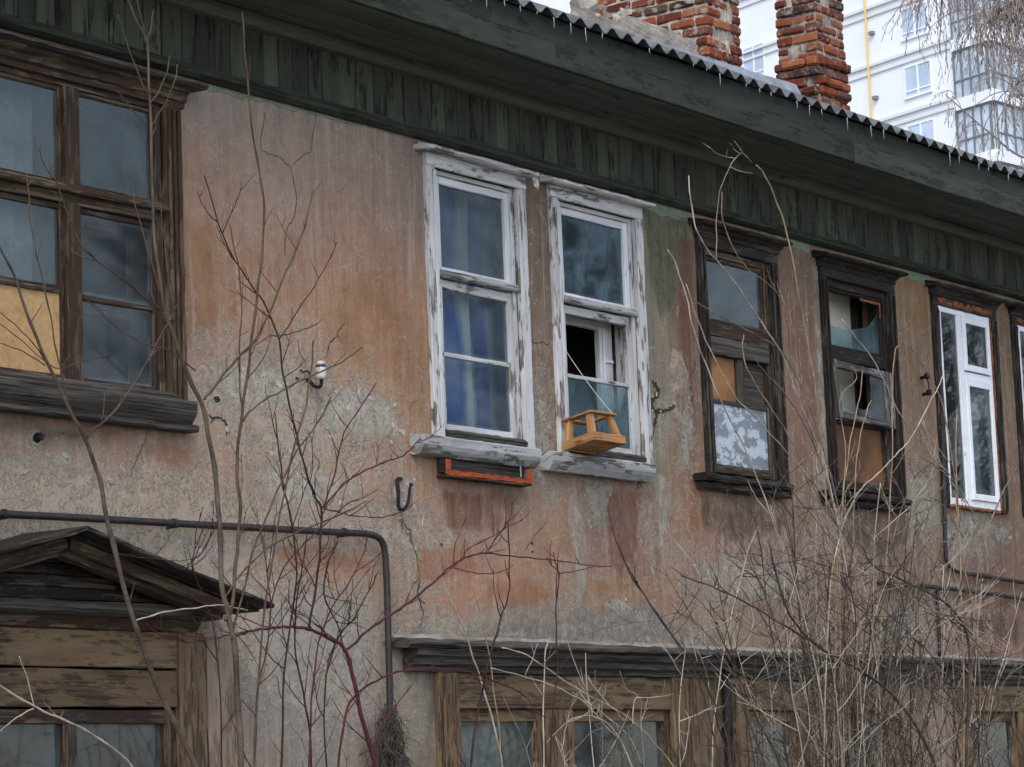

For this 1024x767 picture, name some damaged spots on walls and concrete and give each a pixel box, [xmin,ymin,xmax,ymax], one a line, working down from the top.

peeling [211,363,305,413]
peeling [321,385,405,444]
peeling [534,399,551,451]
crack [651,361,696,435]
peeling [680,393,694,470]
peeling [262,448,361,506]
peeling [393,478,416,509]
peeling [177,538,272,559]